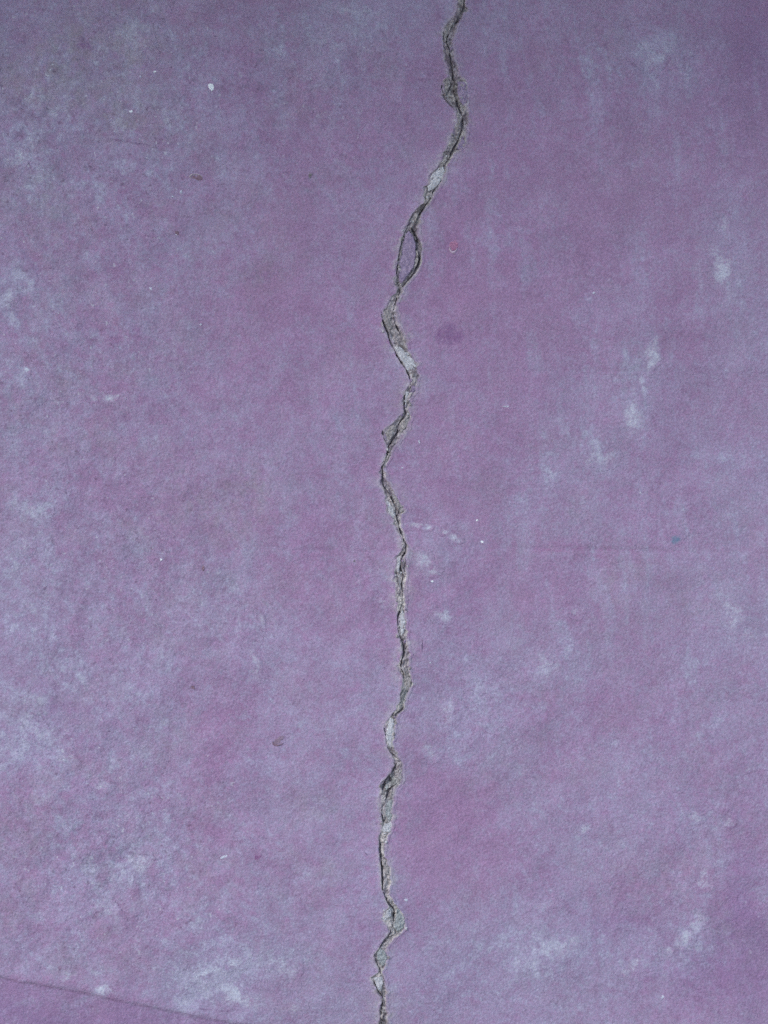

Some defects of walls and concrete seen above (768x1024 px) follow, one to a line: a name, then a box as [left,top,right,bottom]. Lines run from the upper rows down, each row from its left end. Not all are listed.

crack [367,0,472,1024]